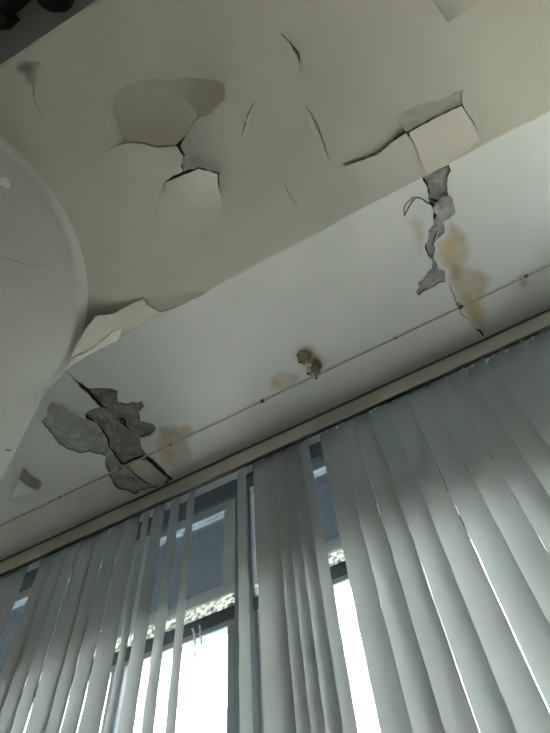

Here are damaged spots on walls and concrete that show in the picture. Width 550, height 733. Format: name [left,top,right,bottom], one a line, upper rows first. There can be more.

peeling [345,88,480,295]
leakage [403,213,497,336]
peeling [11,467,42,500]
spalling [42,290,209,494]
crack [0,264,550,526]